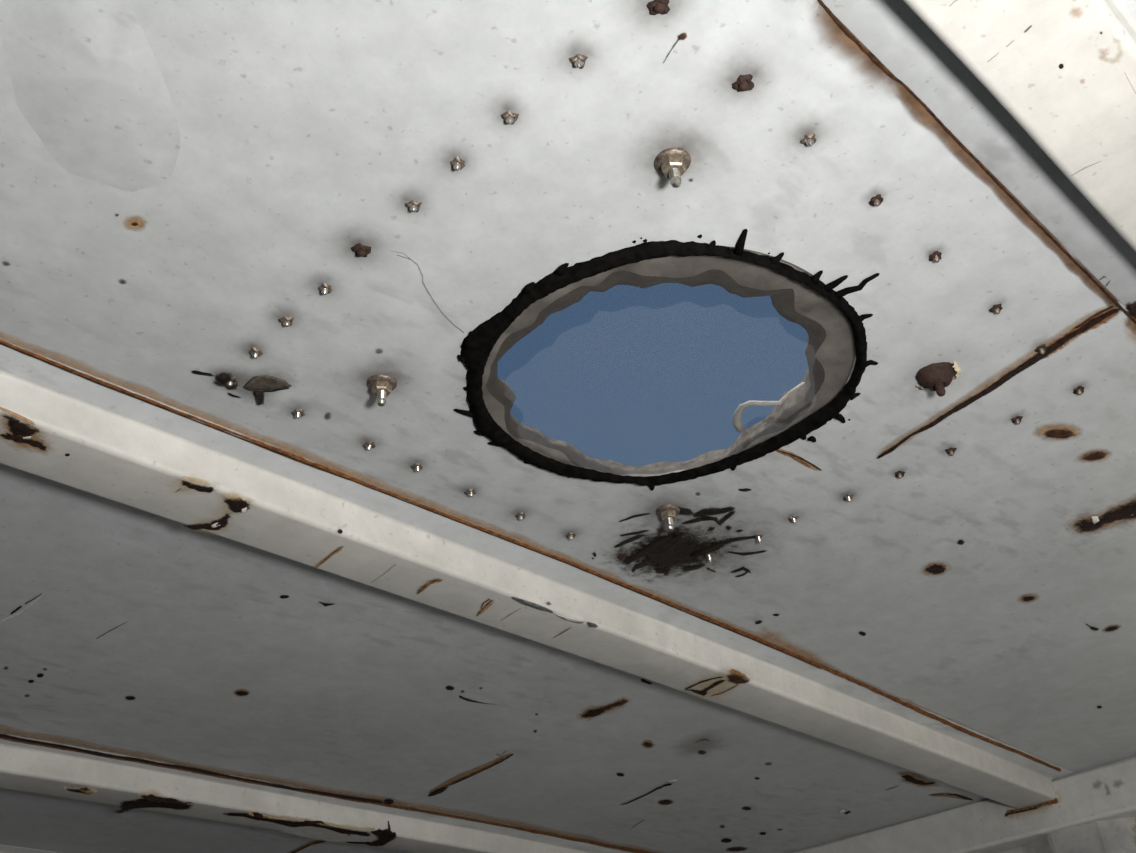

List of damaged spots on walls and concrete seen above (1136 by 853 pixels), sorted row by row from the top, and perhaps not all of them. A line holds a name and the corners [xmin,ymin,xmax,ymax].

rust [1037,425,1078,439]
rust [1081,450,1109,461]
rust [1075,501,1136,533]
rust [0,340,1061,771]
rust [0,734,650,853]